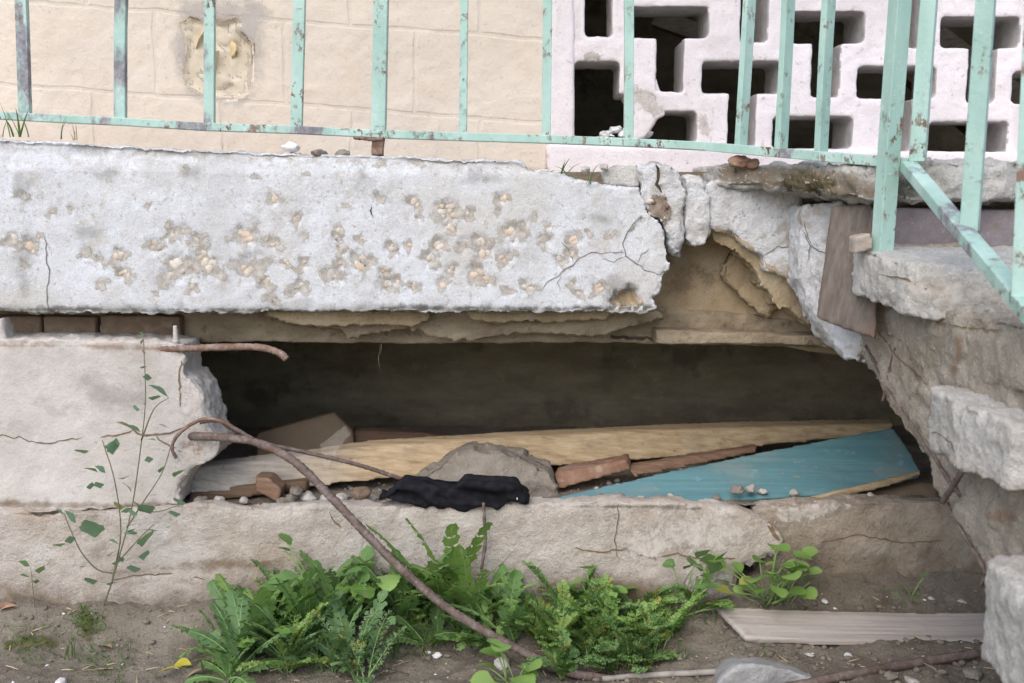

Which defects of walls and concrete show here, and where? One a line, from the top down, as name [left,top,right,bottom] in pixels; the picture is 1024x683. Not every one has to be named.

peeling [180,18,252,99]
hole [13,189,30,200]
spalling [0,233,44,268]
crack [43,237,51,307]
spalling [76,178,643,308]
crack [541,219,663,291]
spalling [715,227,789,278]
crack [0,361,195,452]
spalling [175,384,217,480]
crack [575,506,700,561]
crack [820,534,933,544]